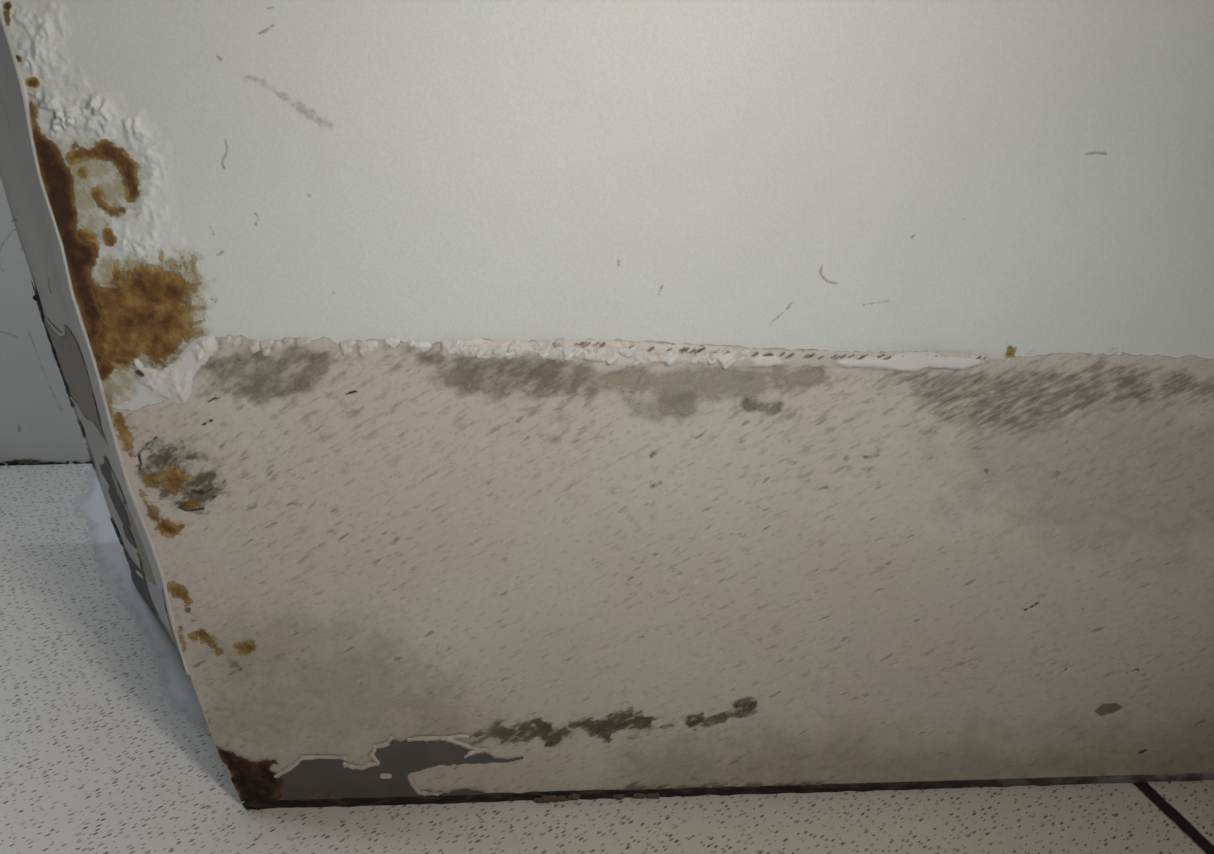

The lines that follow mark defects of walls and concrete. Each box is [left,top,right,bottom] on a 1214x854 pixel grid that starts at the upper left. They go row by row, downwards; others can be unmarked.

corrosion [3,2,12,26]
corrosion [26,77,205,457]
peeling [219,336,311,356]
peeling [339,337,1005,372]
peeling [31,281,185,670]
corrosion [139,464,199,538]
water stain [111,335,1214,795]
corrosion [167,581,192,613]
corrosion [179,627,256,670]
corrosion [216,746,284,801]
peeling [274,734,523,800]